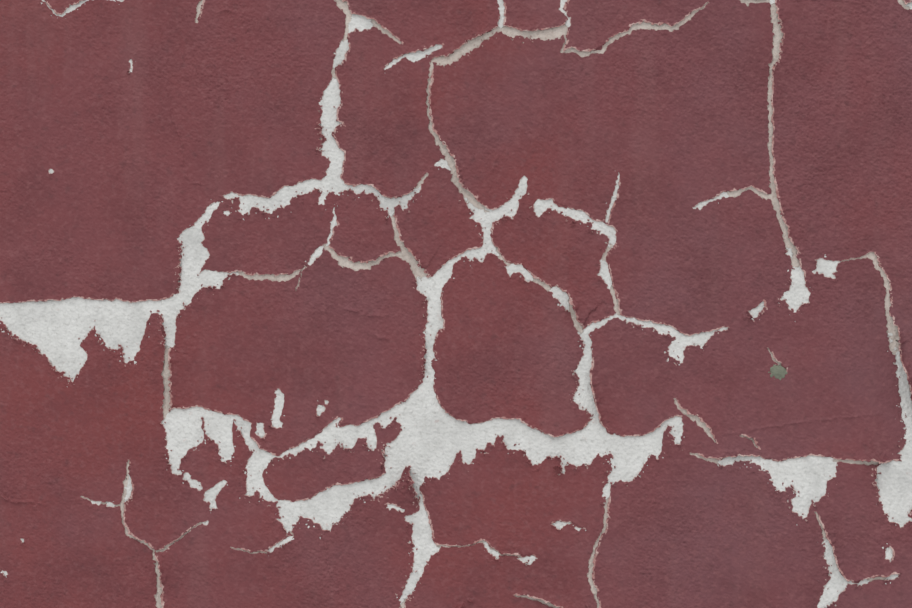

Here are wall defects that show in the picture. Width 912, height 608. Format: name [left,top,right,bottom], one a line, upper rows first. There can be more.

crack [41,0,124,17]
crack [195,0,203,23]
crack [898,0,912,10]
crack [384,0,708,213]
crack [693,0,810,315]
crack [295,204,407,289]
peeling [0,0,728,608]
crack [674,398,716,443]
peeling [690,252,912,608]
crack [81,460,209,608]
crack [437,540,537,565]
crack [515,497,610,608]